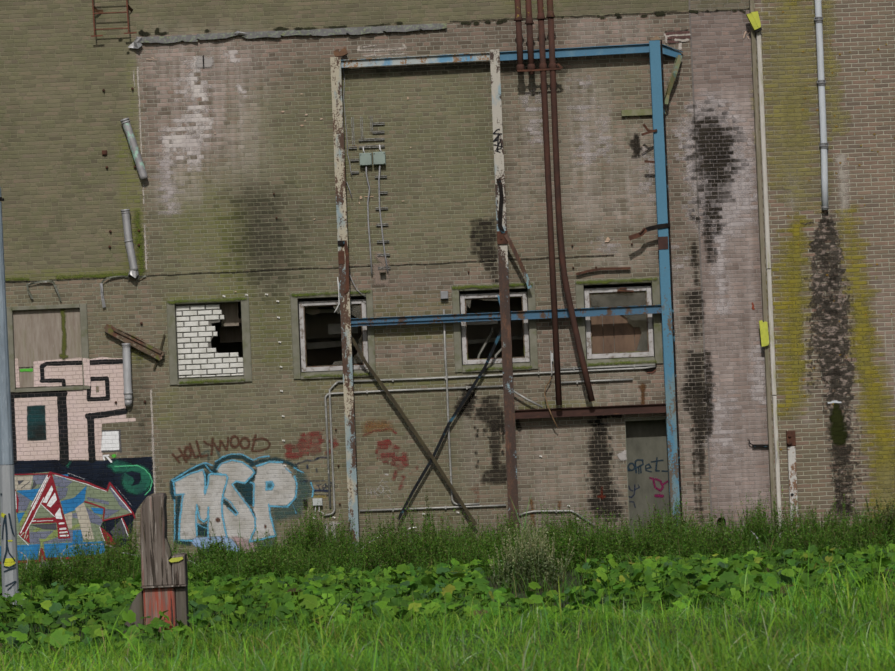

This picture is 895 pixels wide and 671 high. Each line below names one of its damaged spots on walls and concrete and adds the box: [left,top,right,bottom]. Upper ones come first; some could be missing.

damp [223,50,241,63]
damp [160,56,214,212]
damp [470,220,498,284]
damp [675,96,757,336]
damp [751,345,766,404]
damp [788,154,895,522]
damp [474,395,507,483]
damp [586,416,622,522]
damp [682,350,736,523]